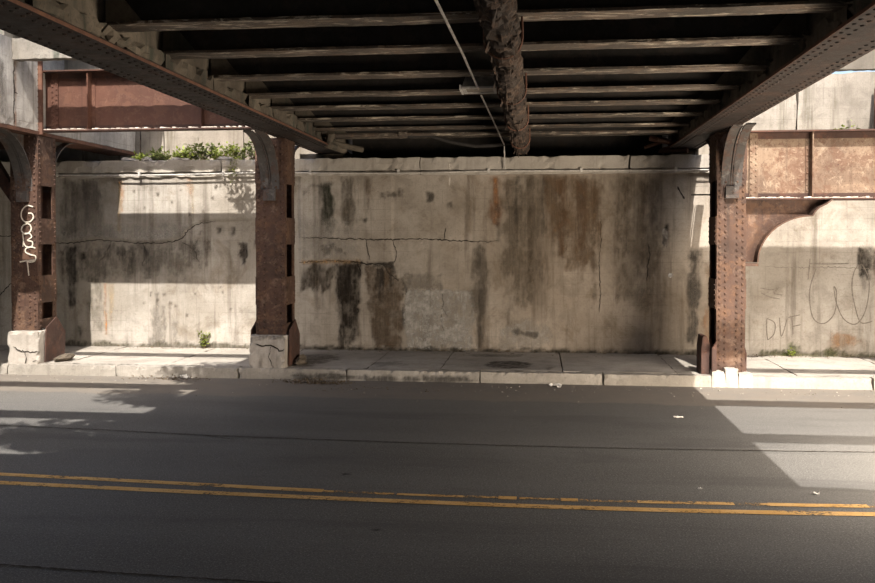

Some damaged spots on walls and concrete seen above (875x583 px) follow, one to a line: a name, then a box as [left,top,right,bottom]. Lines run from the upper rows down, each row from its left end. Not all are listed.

crack [59,221,216,263]
damp [322,180,355,228]
damp [302,262,407,366]
crack [299,229,497,281]
damp [503,177,601,297]
damp [687,251,700,344]